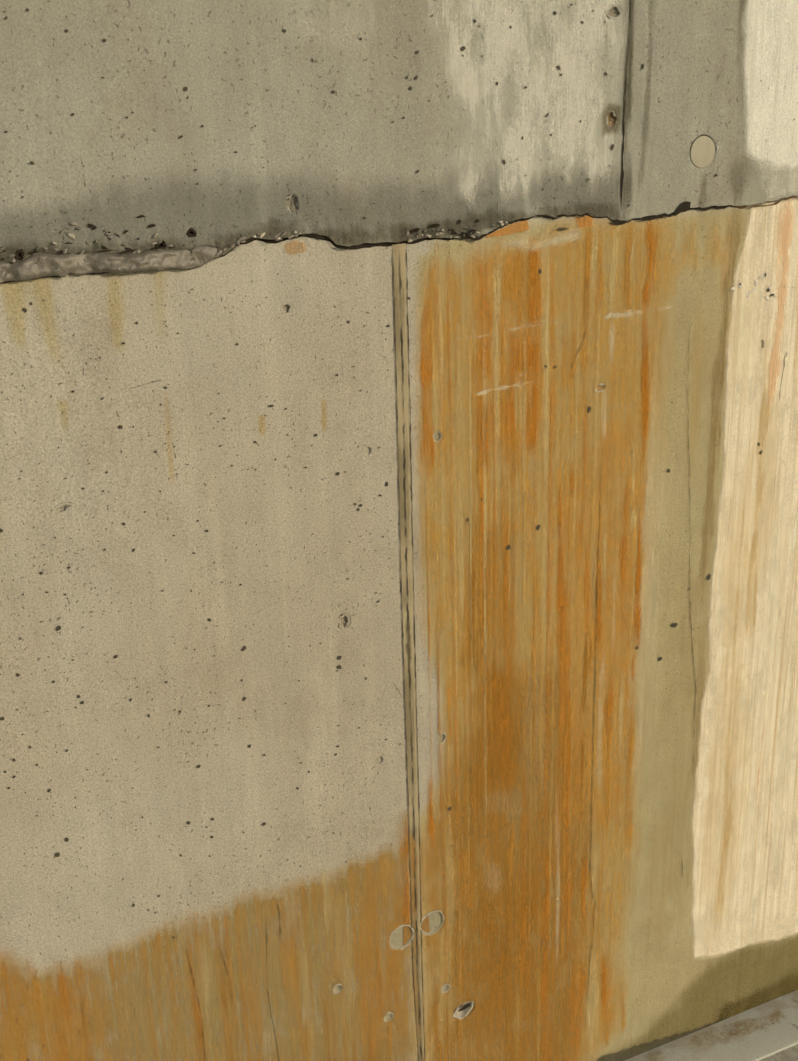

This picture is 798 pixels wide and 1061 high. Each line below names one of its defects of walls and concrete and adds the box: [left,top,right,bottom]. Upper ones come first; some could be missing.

spalling [88,224,140,253]
spalling [151,228,197,250]
crack [185,195,798,270]
spalling [0,249,38,260]
rust [0,824,430,1061]